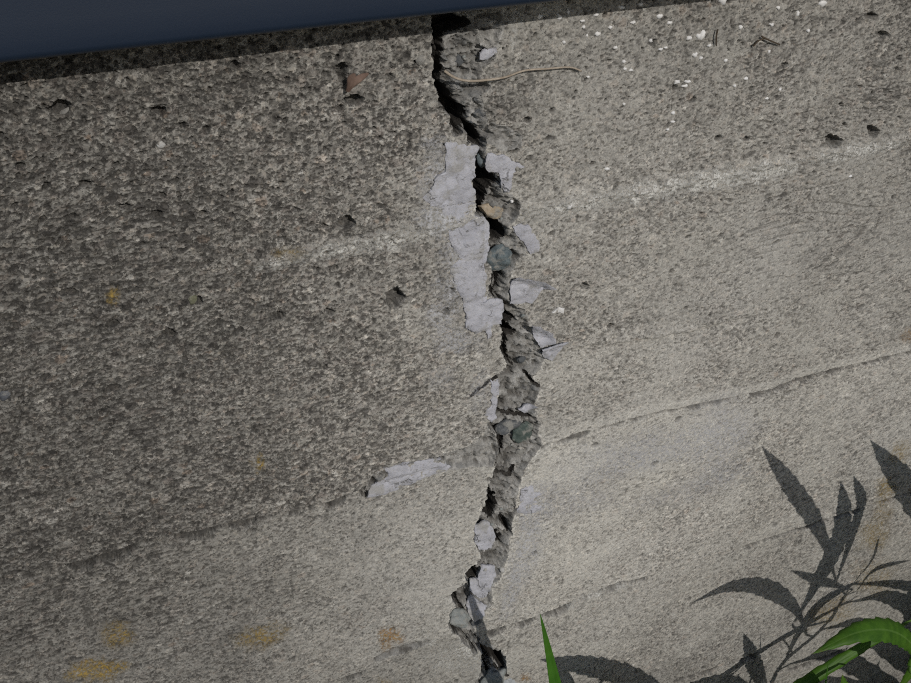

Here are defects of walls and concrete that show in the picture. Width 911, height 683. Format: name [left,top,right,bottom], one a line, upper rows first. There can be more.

flaking render [423,140,557,339]
flaking render [532,325,569,361]
crack [406,10,911,683]
flaking render [364,379,500,498]
crack [325,661,386,683]